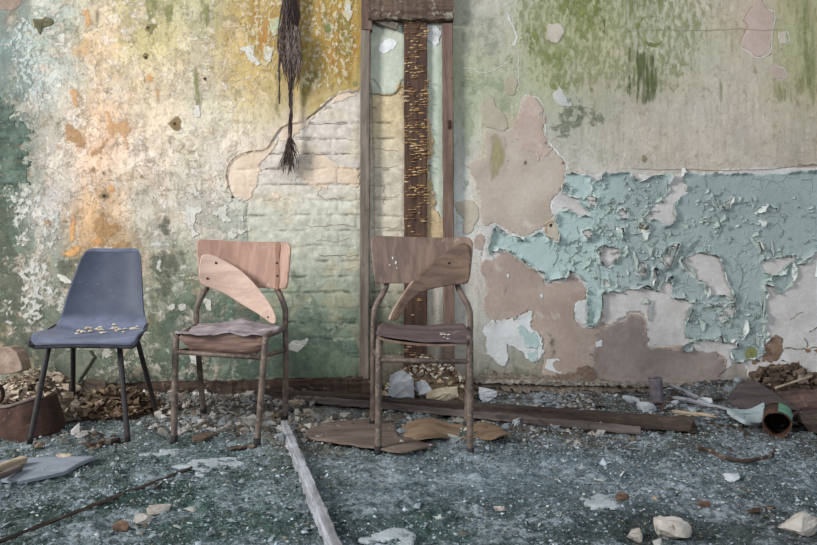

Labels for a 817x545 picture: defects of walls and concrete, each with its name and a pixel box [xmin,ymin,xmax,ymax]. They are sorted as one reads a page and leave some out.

spalling [33,17,54,34]
peeling [739,0,790,58]
flaking render [0,97,34,194]
leakage [168,116,181,130]
peeling [427,23,443,237]
leakage [150,218,184,295]
peeling [183,187,202,238]
flaking render [213,23,404,357]
peeling [456,76,817,395]